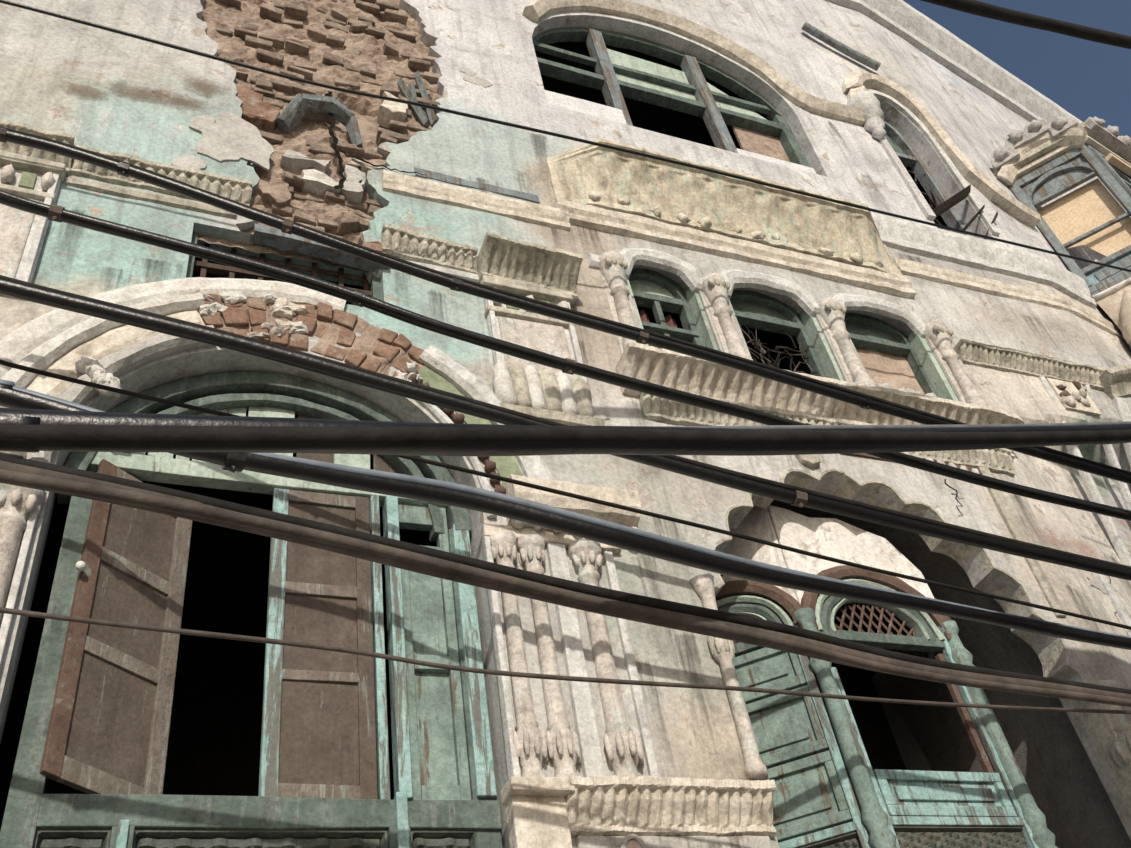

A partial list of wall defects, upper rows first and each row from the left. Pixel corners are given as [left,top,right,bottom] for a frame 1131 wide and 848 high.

spalling [171,0,441,283]
crack [324,91,424,190]
flaking render [189,288,438,383]